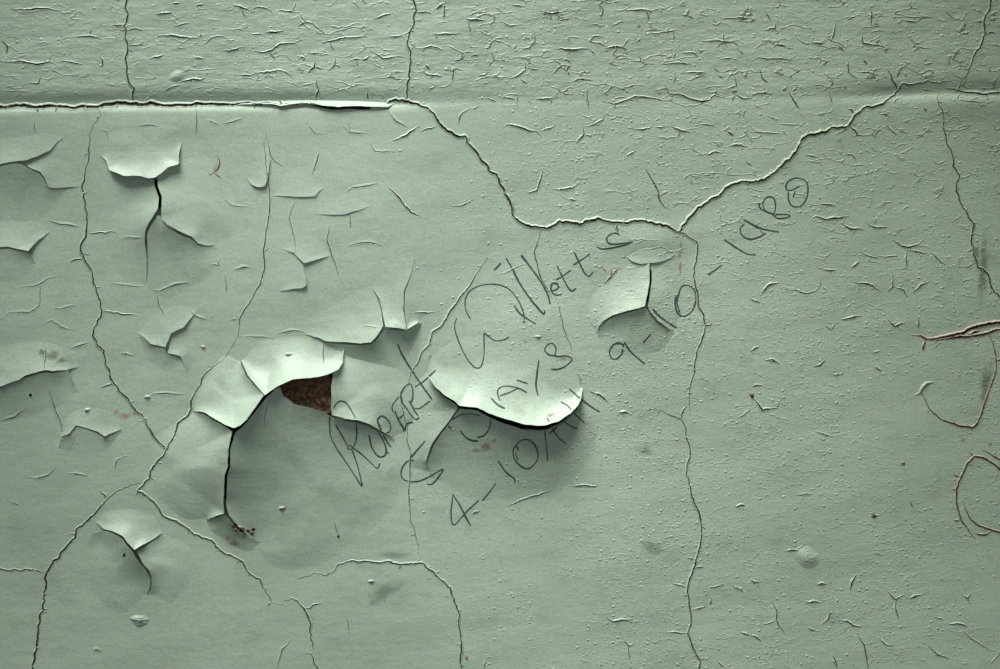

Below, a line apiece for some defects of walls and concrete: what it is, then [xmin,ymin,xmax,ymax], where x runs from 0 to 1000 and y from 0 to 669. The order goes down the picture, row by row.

peeling [0,134,81,282]
peeling [0,340,121,455]
peeling [80,509,194,613]
peeling [101,124,238,372]
crack [0,0,367,669]
crack [324,182,420,275]
peeling [150,257,598,570]
crack [296,257,488,669]
peeling [588,248,683,355]
crack [342,0,1000,669]